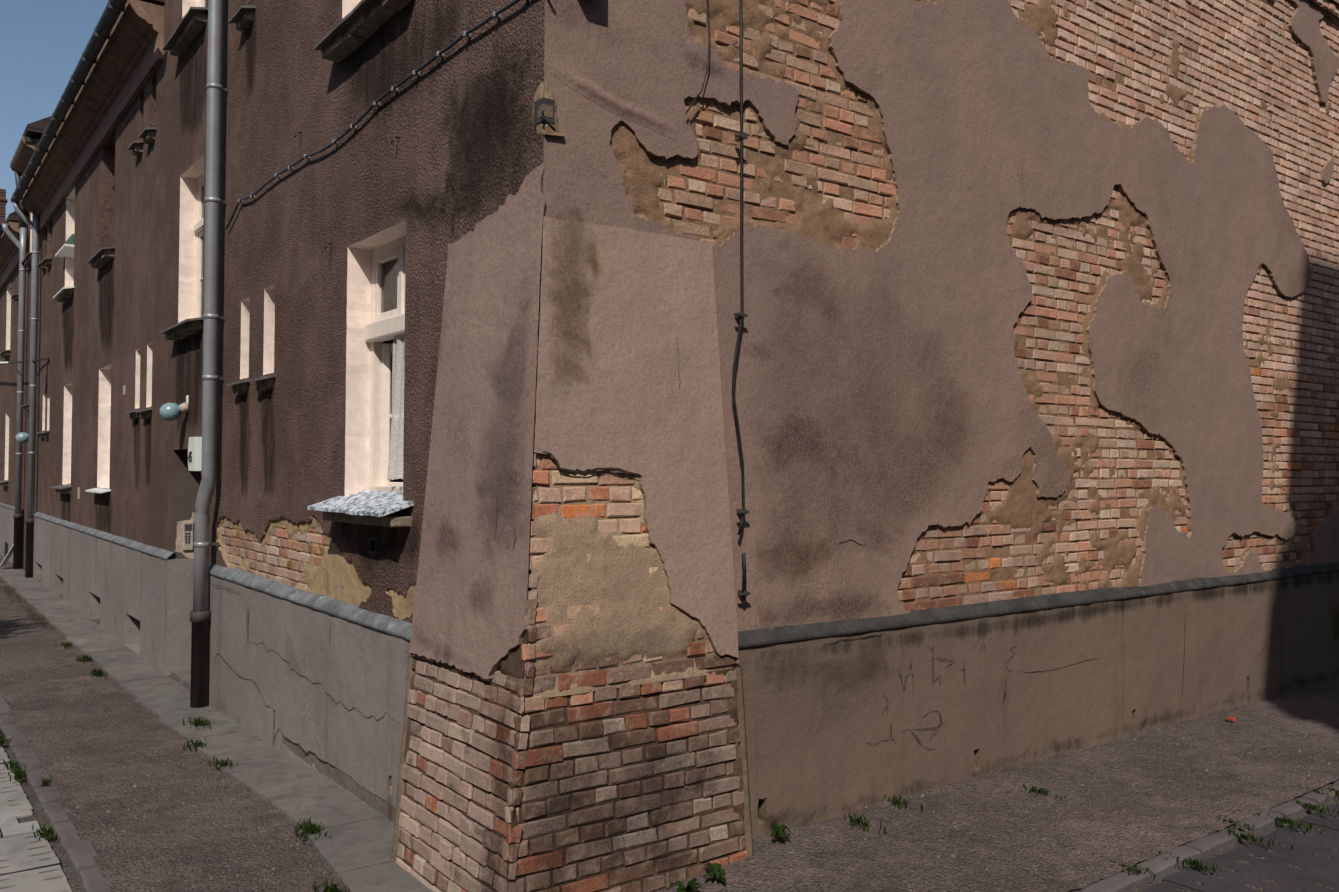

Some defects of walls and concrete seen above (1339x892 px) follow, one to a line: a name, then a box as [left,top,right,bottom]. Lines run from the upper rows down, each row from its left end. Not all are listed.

flaking render [218,516,371,606]
crack [215,638,399,770]
spalling [274,420,747,892]
flaking render [610,0,898,251]
flaking render [898,185,1188,612]
flaking render [1008,0,1339,572]